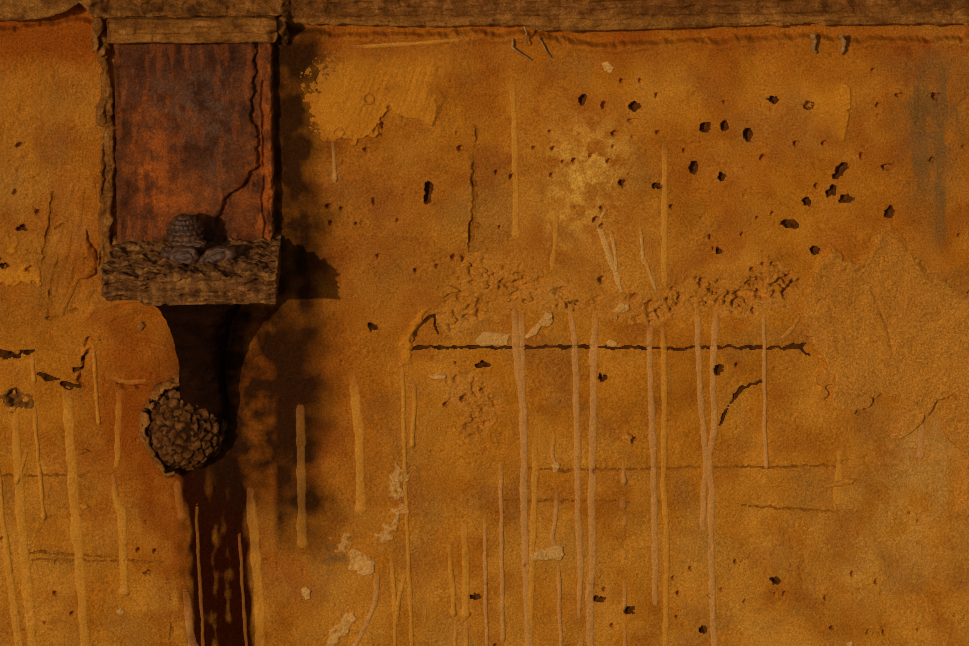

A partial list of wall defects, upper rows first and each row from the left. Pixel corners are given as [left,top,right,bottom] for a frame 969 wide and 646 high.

spalling [565,261,806,331]
crack [0,338,101,390]
flaking render [475,331,510,346]
flaking render [525,311,554,339]
crack [411,314,810,356]
rust [72,300,265,646]